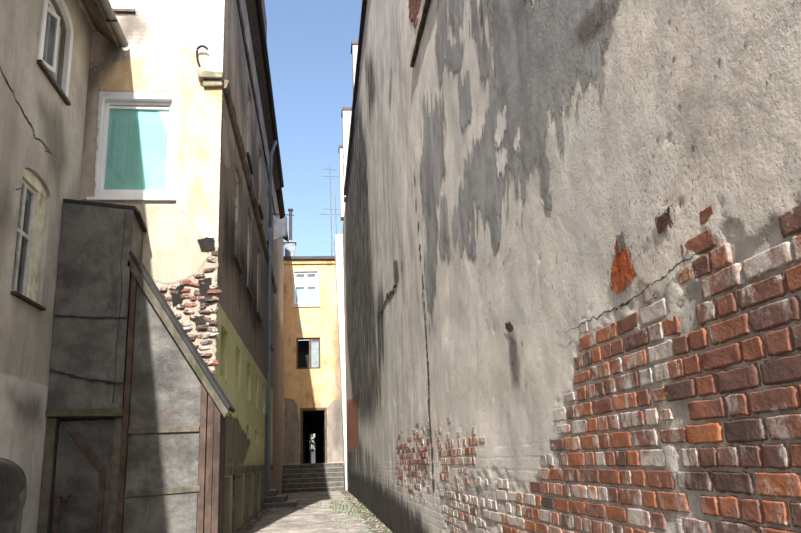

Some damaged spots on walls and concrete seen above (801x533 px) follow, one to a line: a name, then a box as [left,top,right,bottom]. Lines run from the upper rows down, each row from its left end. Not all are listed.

crack [0,67,61,188]
peeling [79,34,230,376]
flaking render [395,0,801,533]
crack [562,243,714,333]